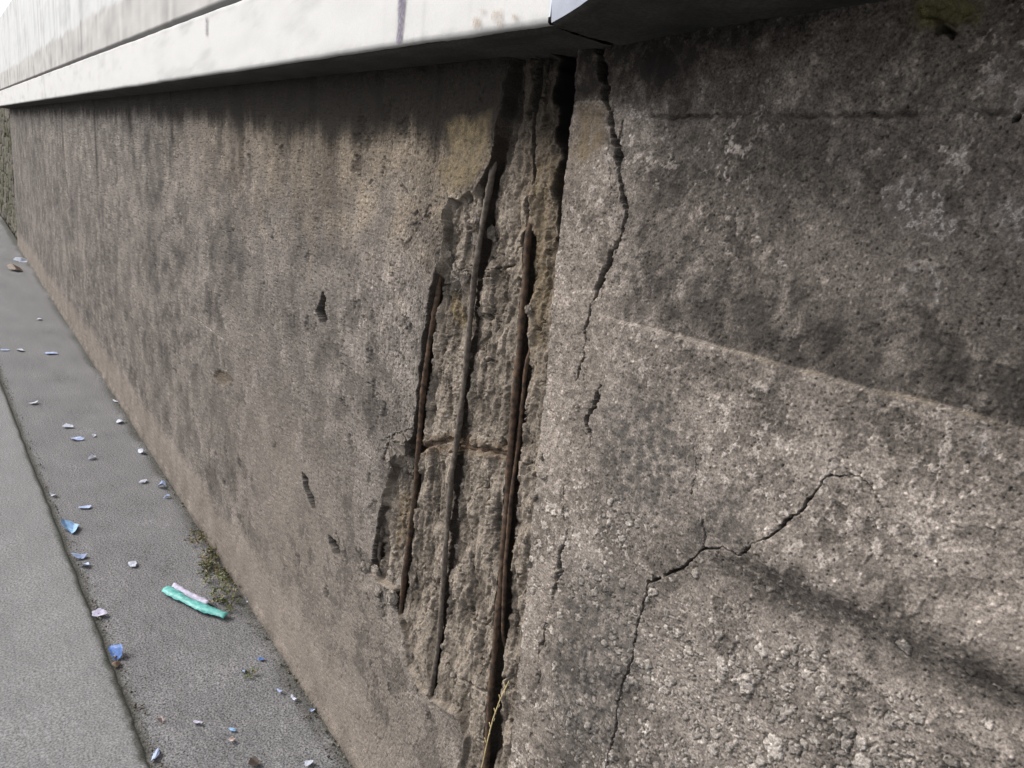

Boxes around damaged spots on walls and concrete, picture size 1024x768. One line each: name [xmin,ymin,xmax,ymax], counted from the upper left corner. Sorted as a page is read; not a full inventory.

damp [10,57,512,169]
spalling [359,53,577,768]
crack [574,40,630,486]
crack [604,449,884,768]